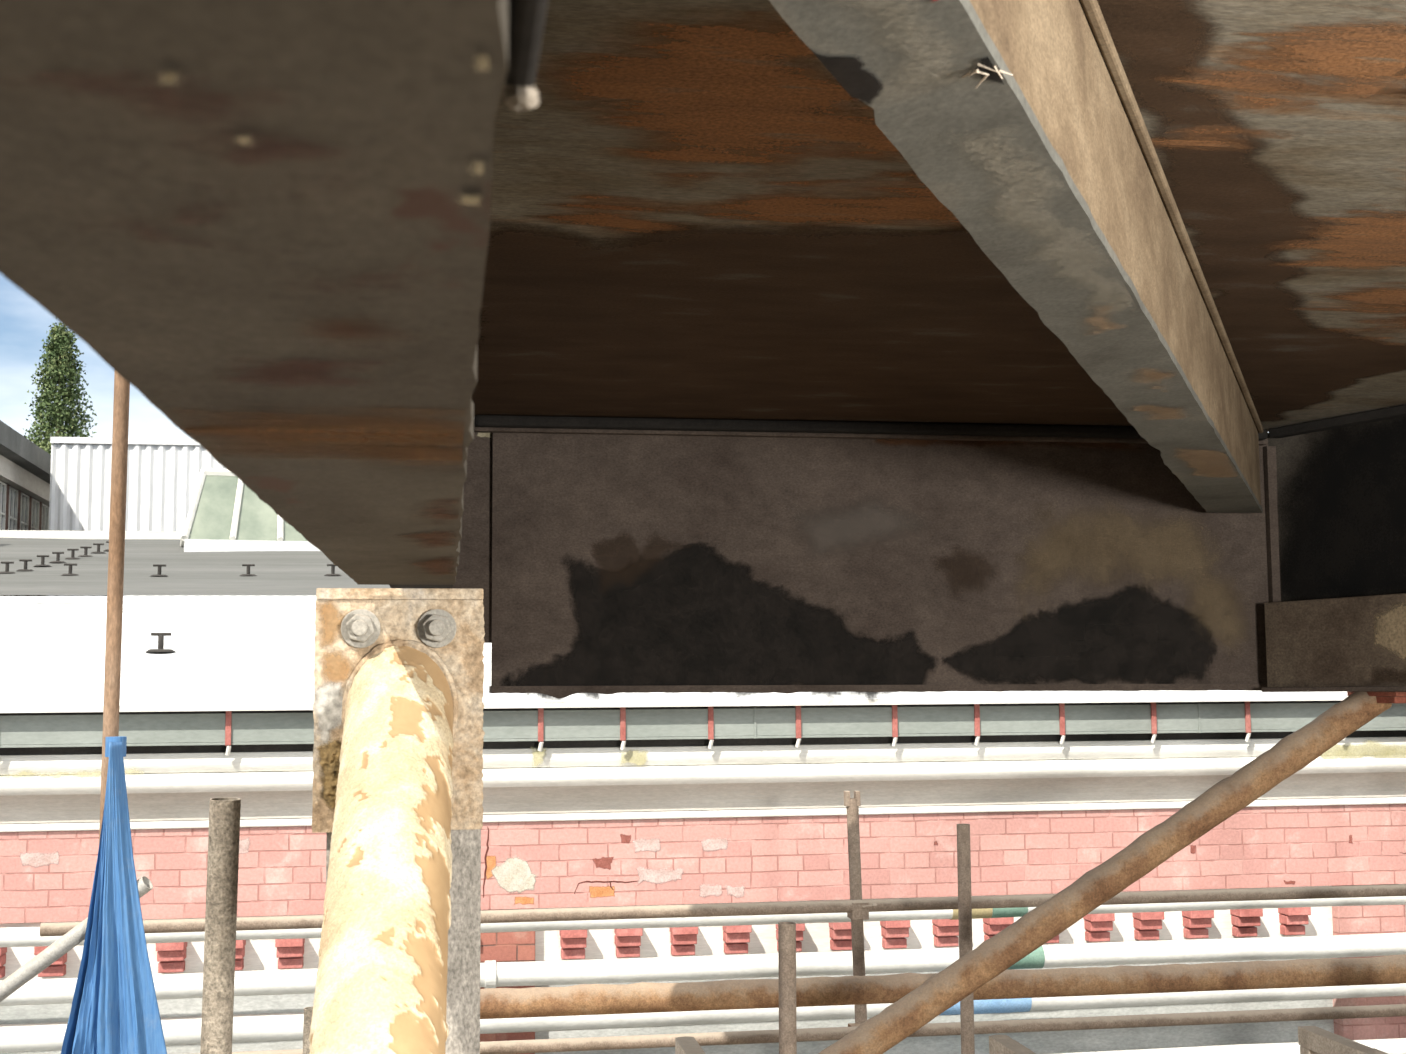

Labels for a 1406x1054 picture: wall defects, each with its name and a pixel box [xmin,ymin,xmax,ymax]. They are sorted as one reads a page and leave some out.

rust [536,13,962,234]
leakage [1097,0,1406,422]
rust [321,602,350,685]
rust [317,739,342,809]